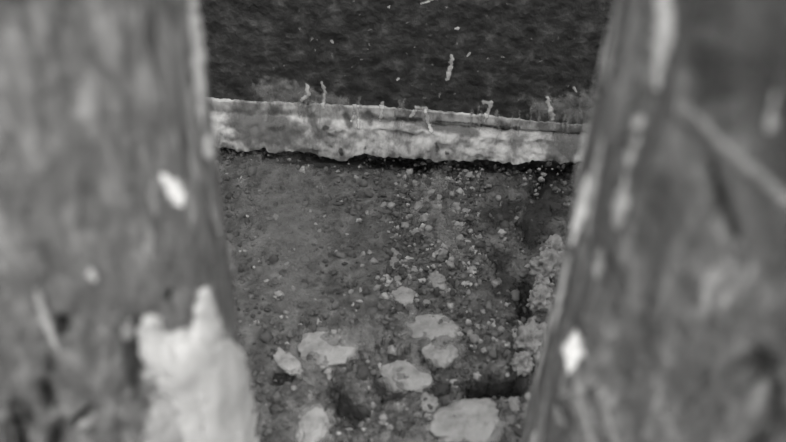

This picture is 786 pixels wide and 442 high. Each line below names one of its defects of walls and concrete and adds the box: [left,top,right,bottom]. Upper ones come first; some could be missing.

water stain [189,0,216,161]
water stain [445,54,454,81]
water stain [229,80,479,172]
water stain [147,173,186,217]
water stain [330,385,370,421]
water stain [373,380,451,403]